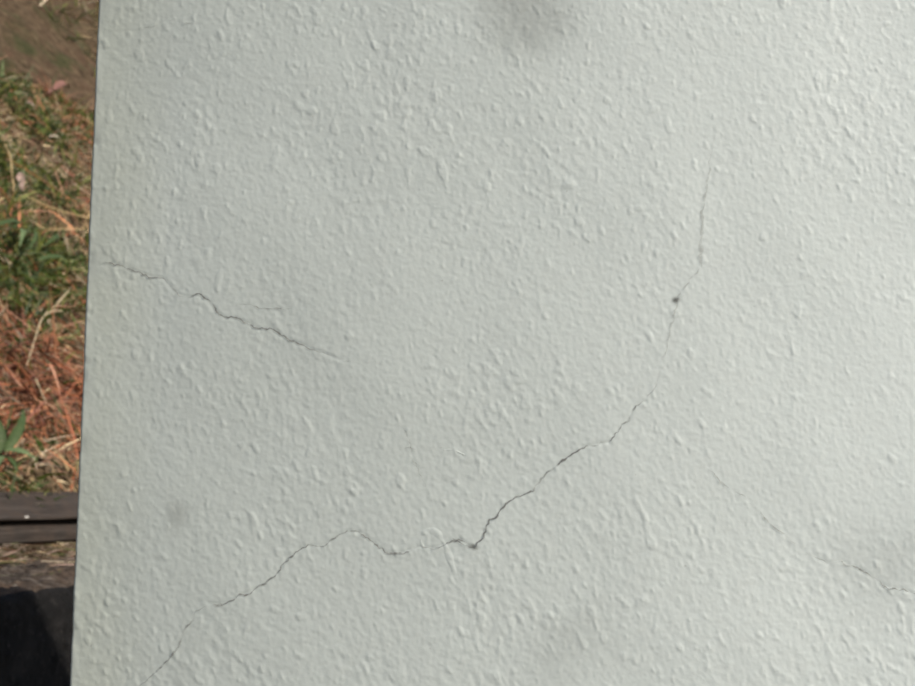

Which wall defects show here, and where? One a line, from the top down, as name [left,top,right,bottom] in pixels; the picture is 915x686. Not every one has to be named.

crack [196,293,312,350]
crack [215,491,533,606]